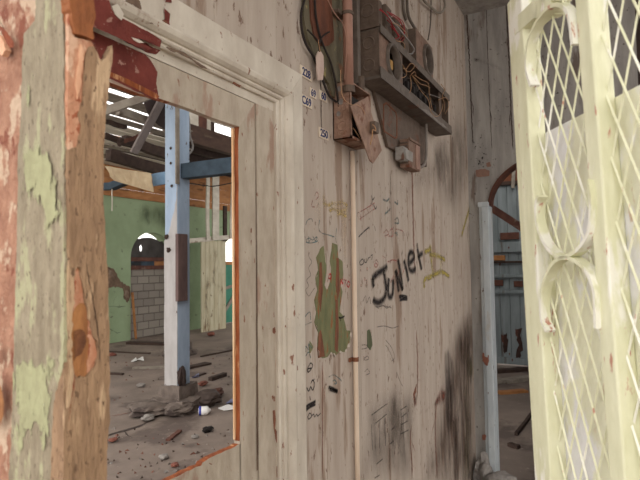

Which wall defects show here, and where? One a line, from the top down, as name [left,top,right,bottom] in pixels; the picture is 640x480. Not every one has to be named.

flaking render [0,26,14,58]
peeling [64,0,214,150]
peeling [22,145,61,230]
flaking render [71,268,97,377]
flaking render [108,267,131,303]
peeling [309,243,352,358]
peeling [13,357,55,451]
leakage [441,325,472,478]